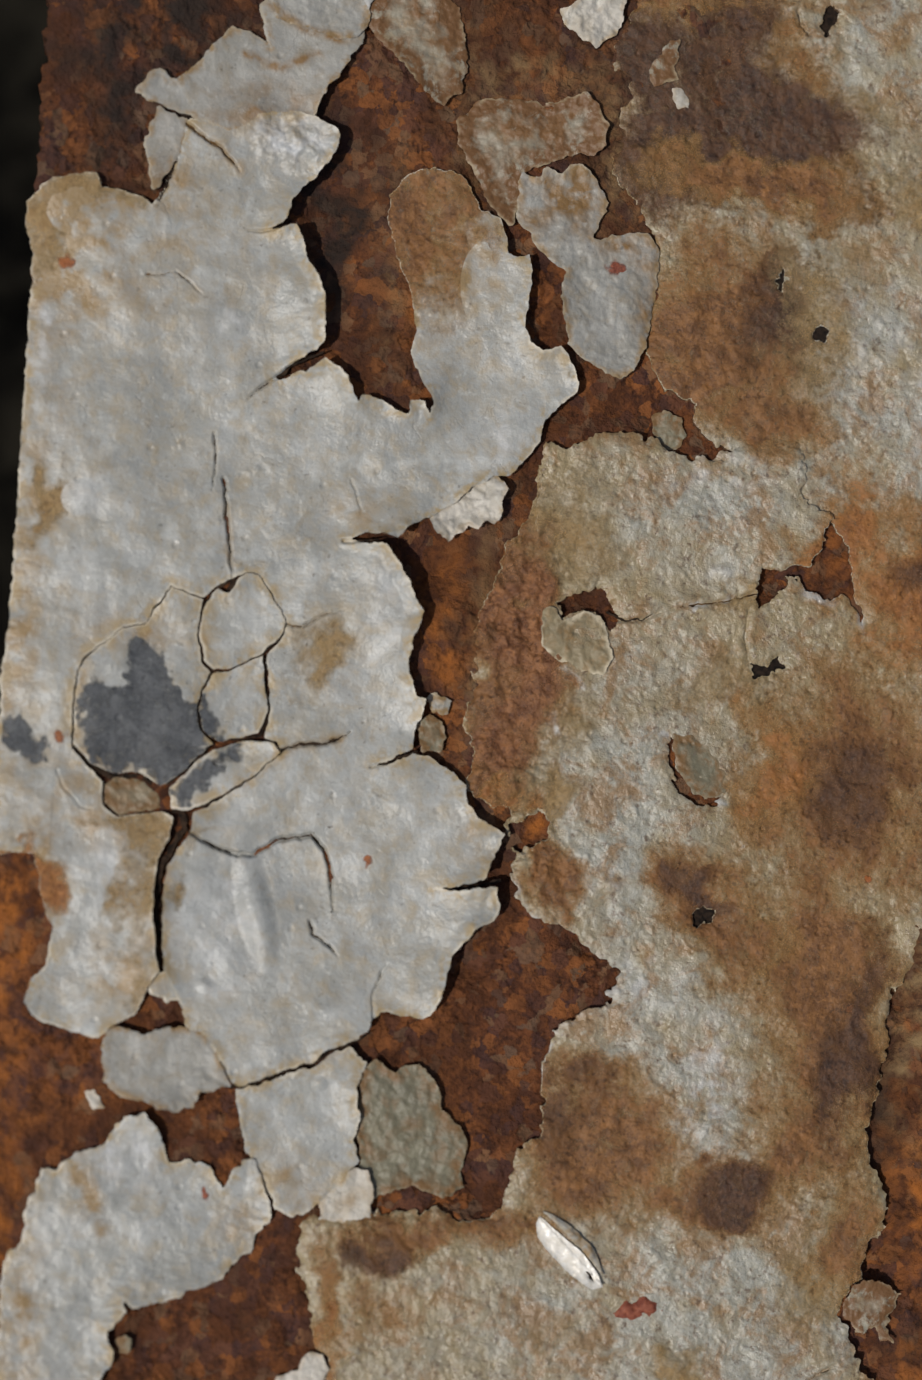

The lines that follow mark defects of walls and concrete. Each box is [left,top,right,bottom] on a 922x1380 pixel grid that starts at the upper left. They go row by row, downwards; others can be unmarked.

rust [388,168,490,307]
spalling [756,523,863,622]
crack [71,433,360,972]
rust [297,620,354,687]
peeling [0,0,726,1380]
rust [0,832,71,913]
rust [94,812,171,931]
rust [311,472,922,1380]
spalling [837,948,922,1380]